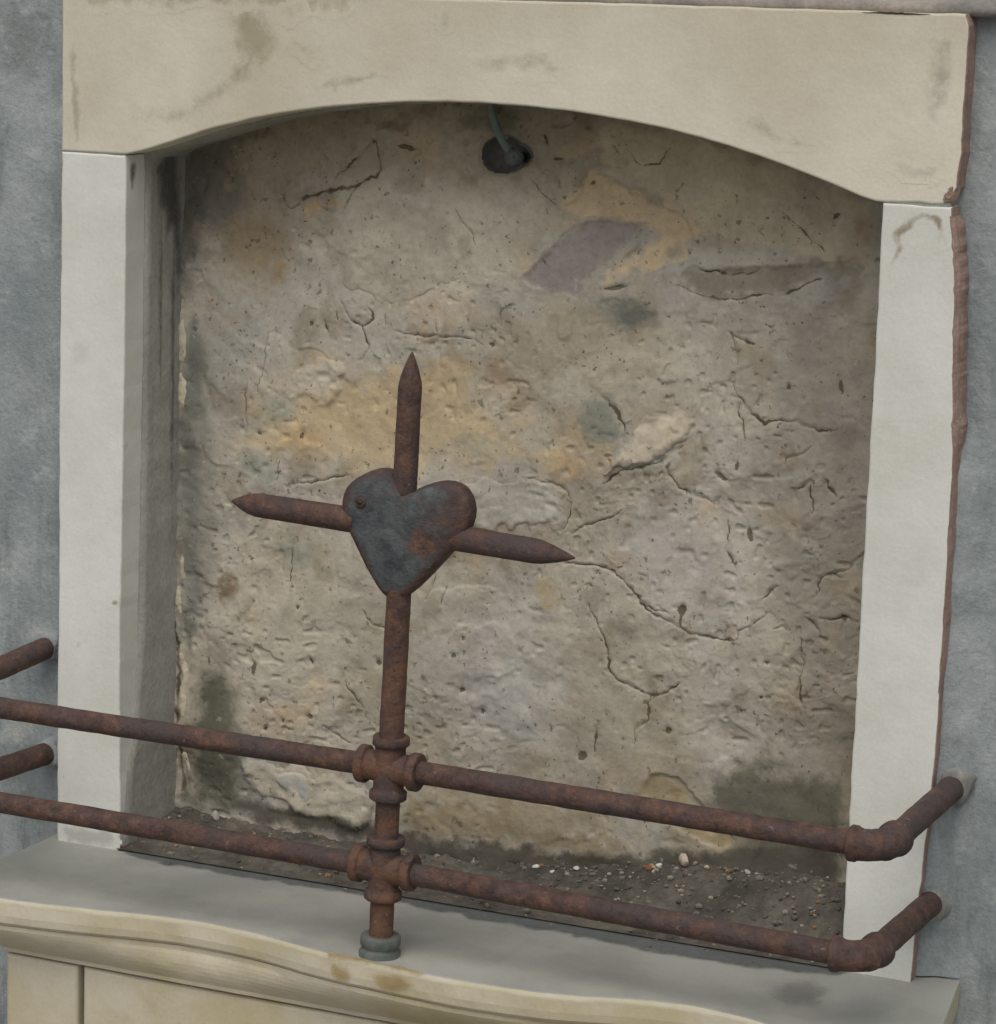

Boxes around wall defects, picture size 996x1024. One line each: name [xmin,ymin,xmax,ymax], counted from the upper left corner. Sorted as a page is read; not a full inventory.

crack [280,139,383,209]
corrosion [838,208,954,271]
leakage [159,119,352,660]
crack [600,395,710,501]
crack [730,332,837,514]
crack [527,477,620,534]
crack [726,520,735,566]
crack [589,605,680,744]
crack [568,552,865,713]
leakage [225,793,375,842]
leakage [399,787,847,883]
leakage [692,749,851,829]